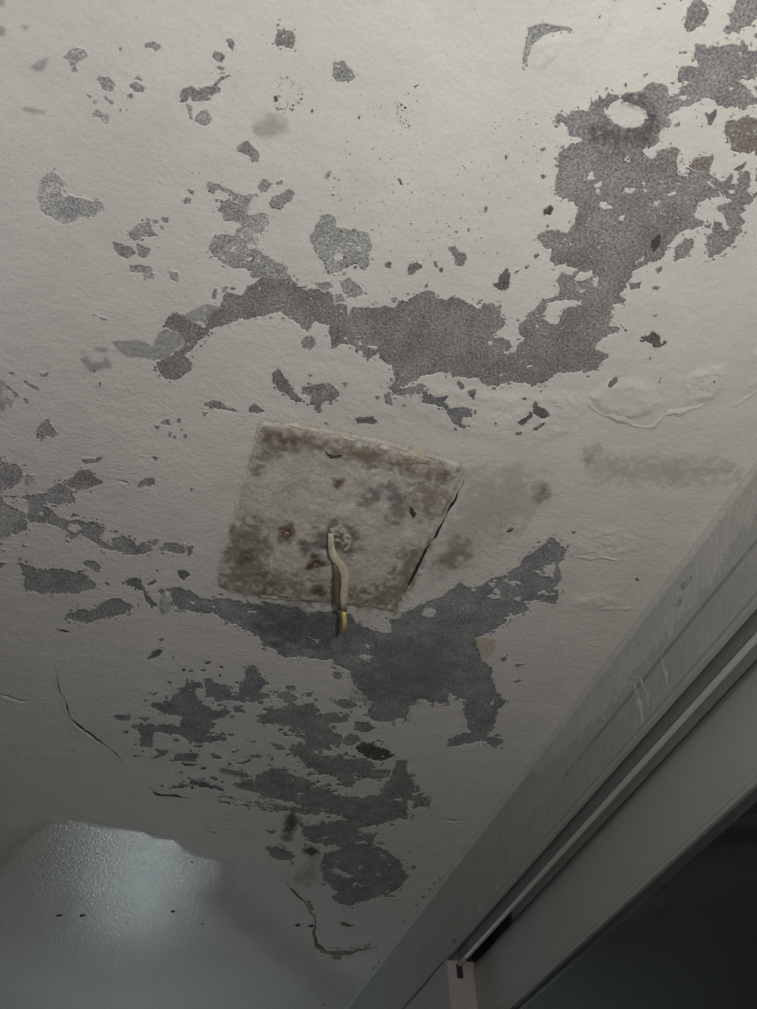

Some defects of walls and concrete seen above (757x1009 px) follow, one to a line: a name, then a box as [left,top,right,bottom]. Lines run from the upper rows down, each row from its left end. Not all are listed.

peeling [36,166,105,227]
peeling [151,0,757,437]
crack [54,664,125,766]
peeling [0,455,577,913]
crack [152,790,189,798]
crack [285,876,379,961]